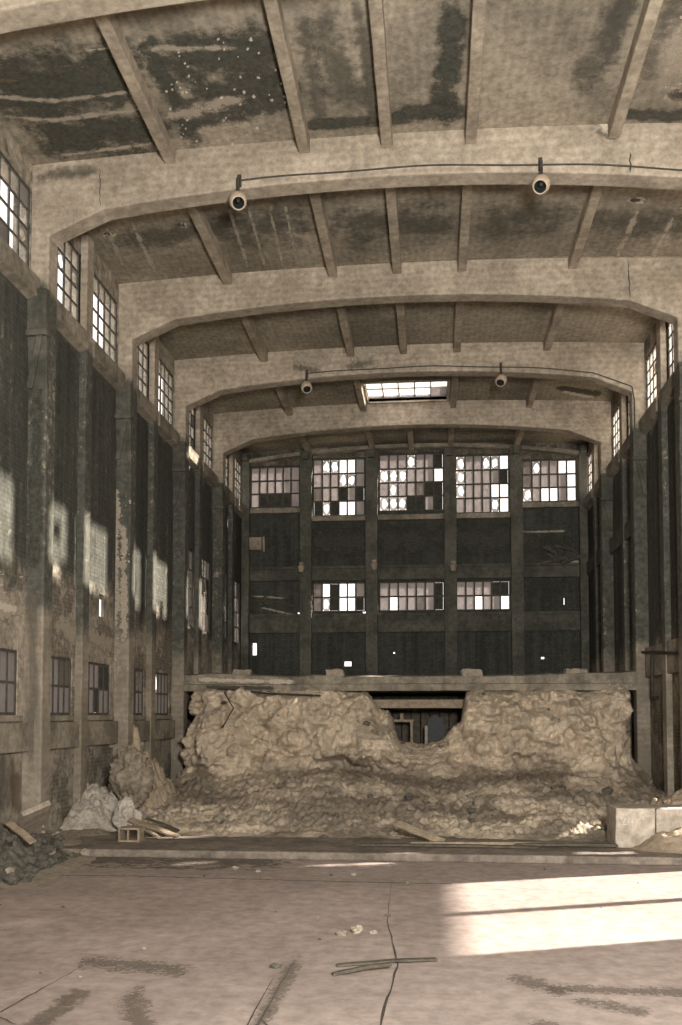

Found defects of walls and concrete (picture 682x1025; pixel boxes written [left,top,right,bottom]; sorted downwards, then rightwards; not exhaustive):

leakage [576,0,636,88]
leakage [644,0,682,93]
leakage [0,91,127,103]
leakage [6,108,139,123]
leakage [627,108,682,123]
leakage [61,142,153,156]
crack [374,882,404,1025]
crack [0,960,93,1025]
crack [247,960,295,1025]